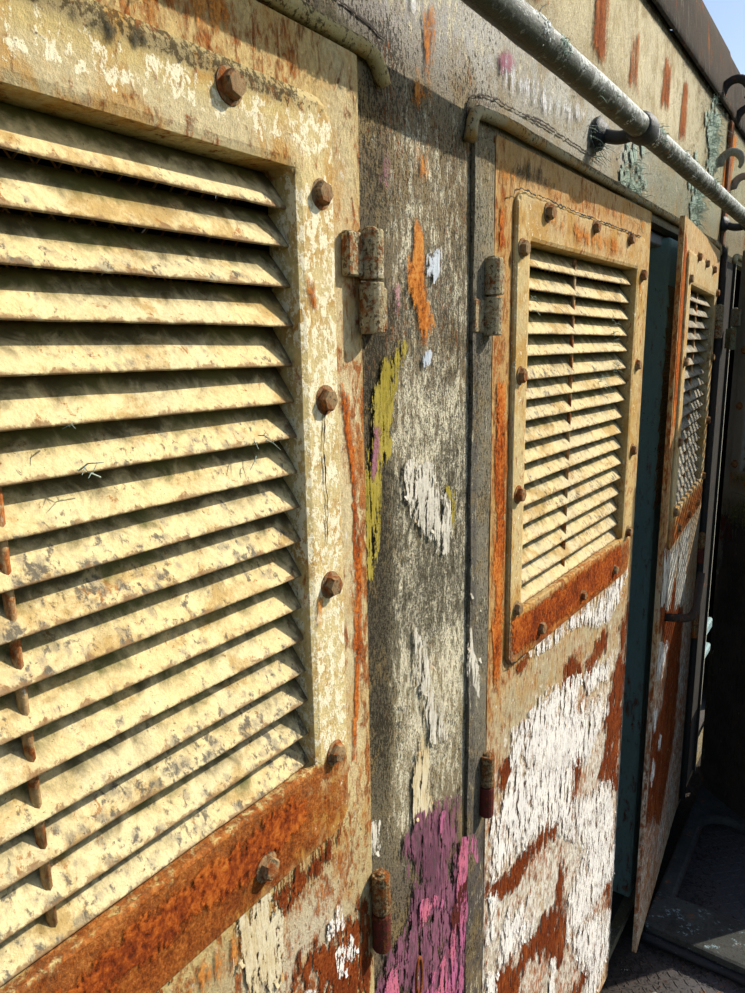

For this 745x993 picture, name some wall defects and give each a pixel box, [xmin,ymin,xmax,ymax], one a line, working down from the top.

corrosion [593,0,610,62]
corrosion [661,56,671,110]
peeling [425,249,443,284]
peeling [404,459,452,557]
corrosion [491,377,622,692]
peeling [529,569,628,657]
corrosion [645,543,684,827]
peeling [485,659,616,993]
corrosion [47,795,309,993]
peeling [233,892,287,993]
corrosion [291,898,373,993]
peeling [325,899,359,979]